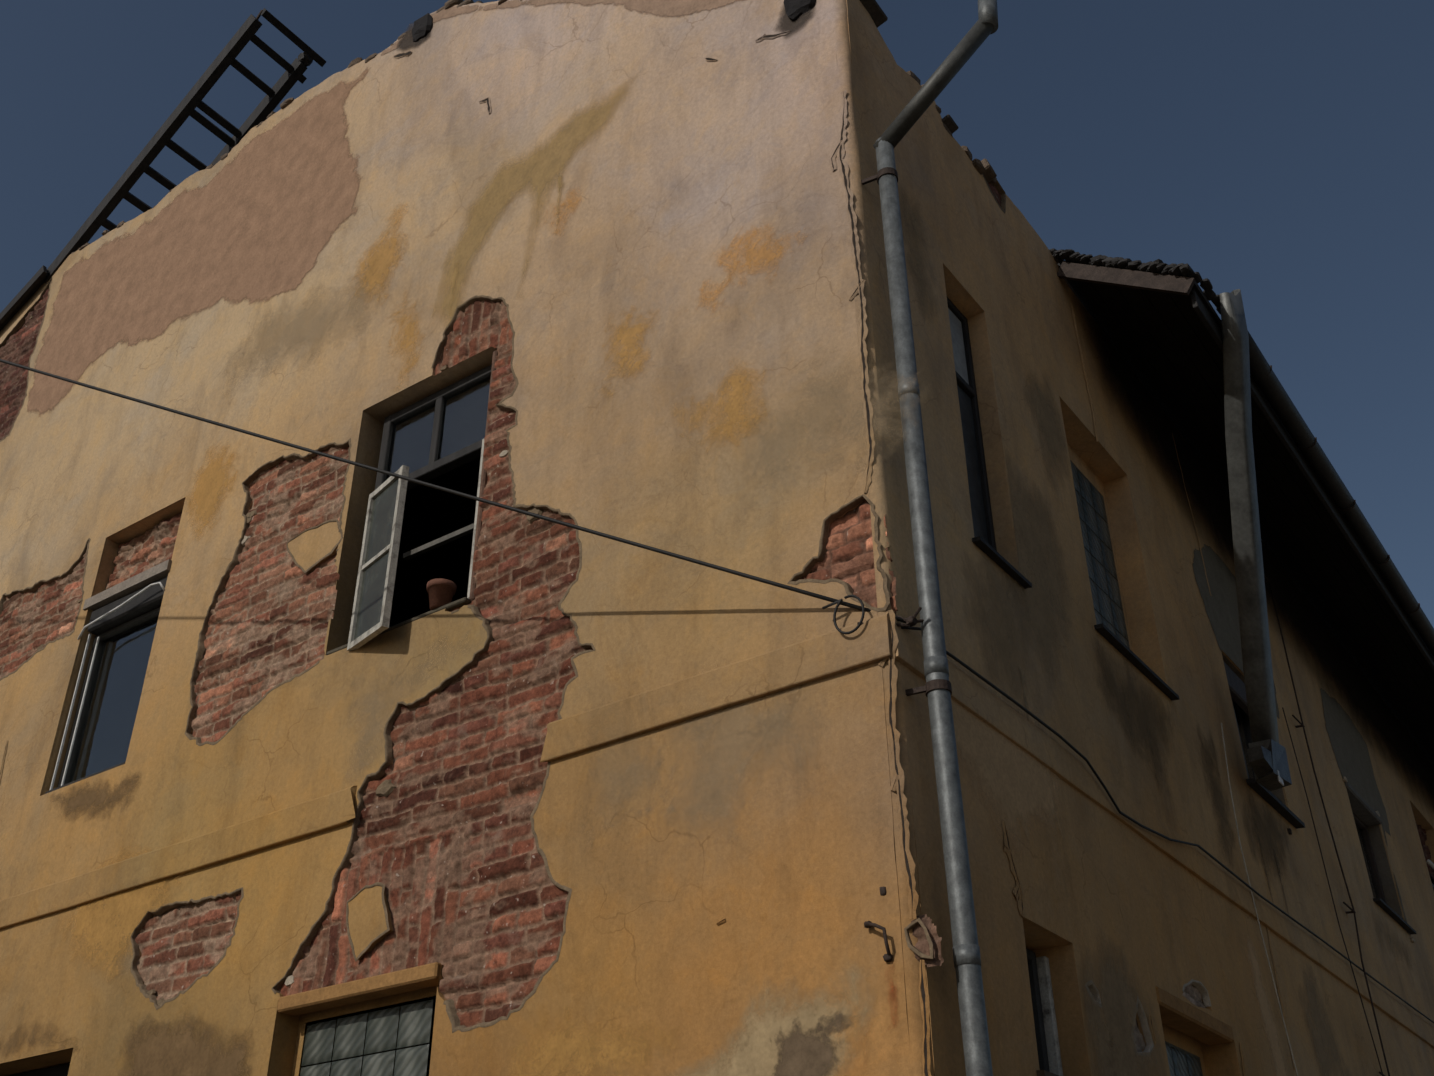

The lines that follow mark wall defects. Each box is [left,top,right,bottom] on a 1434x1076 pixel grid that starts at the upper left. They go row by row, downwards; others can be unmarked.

water stain [443,93,619,317]
flaking render [0,279,52,442]
crack [829,90,875,493]
flaking render [0,538,91,681]
flaking render [185,438,351,746]
flaking render [271,295,596,1033]
flaking render [787,494,898,614]
crack [878,610,919,919]
flaking render [74,879,244,1010]
water stain [686,972,867,1076]
crack [919,960,931,1076]